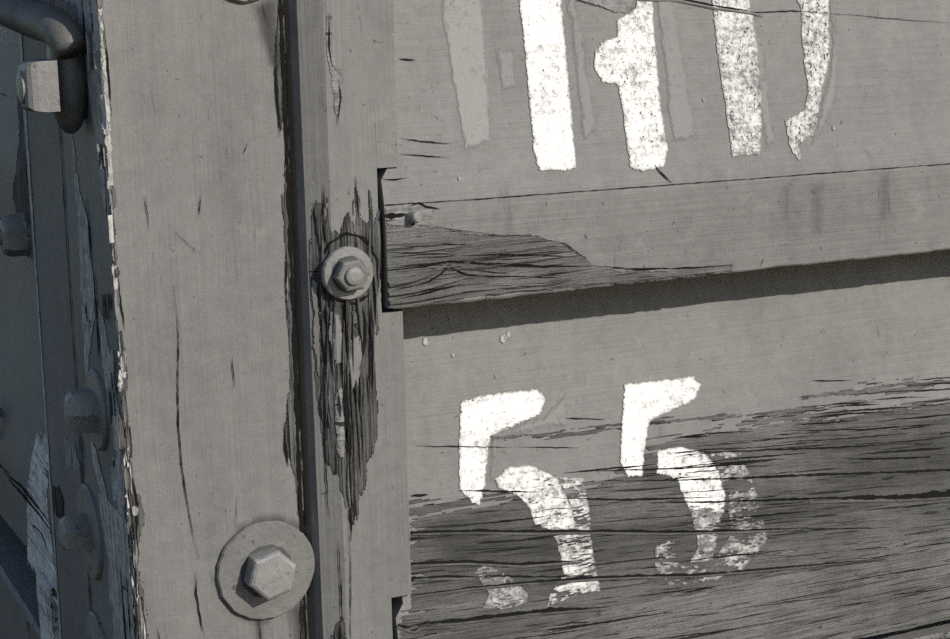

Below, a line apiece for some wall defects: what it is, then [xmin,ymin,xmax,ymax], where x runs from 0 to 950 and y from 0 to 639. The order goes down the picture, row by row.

peeling [325,11,343,125]
crack [636,0,947,23]
peeling [64,0,144,639]
peeling [262,0,304,534]
peeling [312,280,362,458]
peeling [384,201,439,228]
crack [381,138,452,180]
peeling [299,595,307,639]